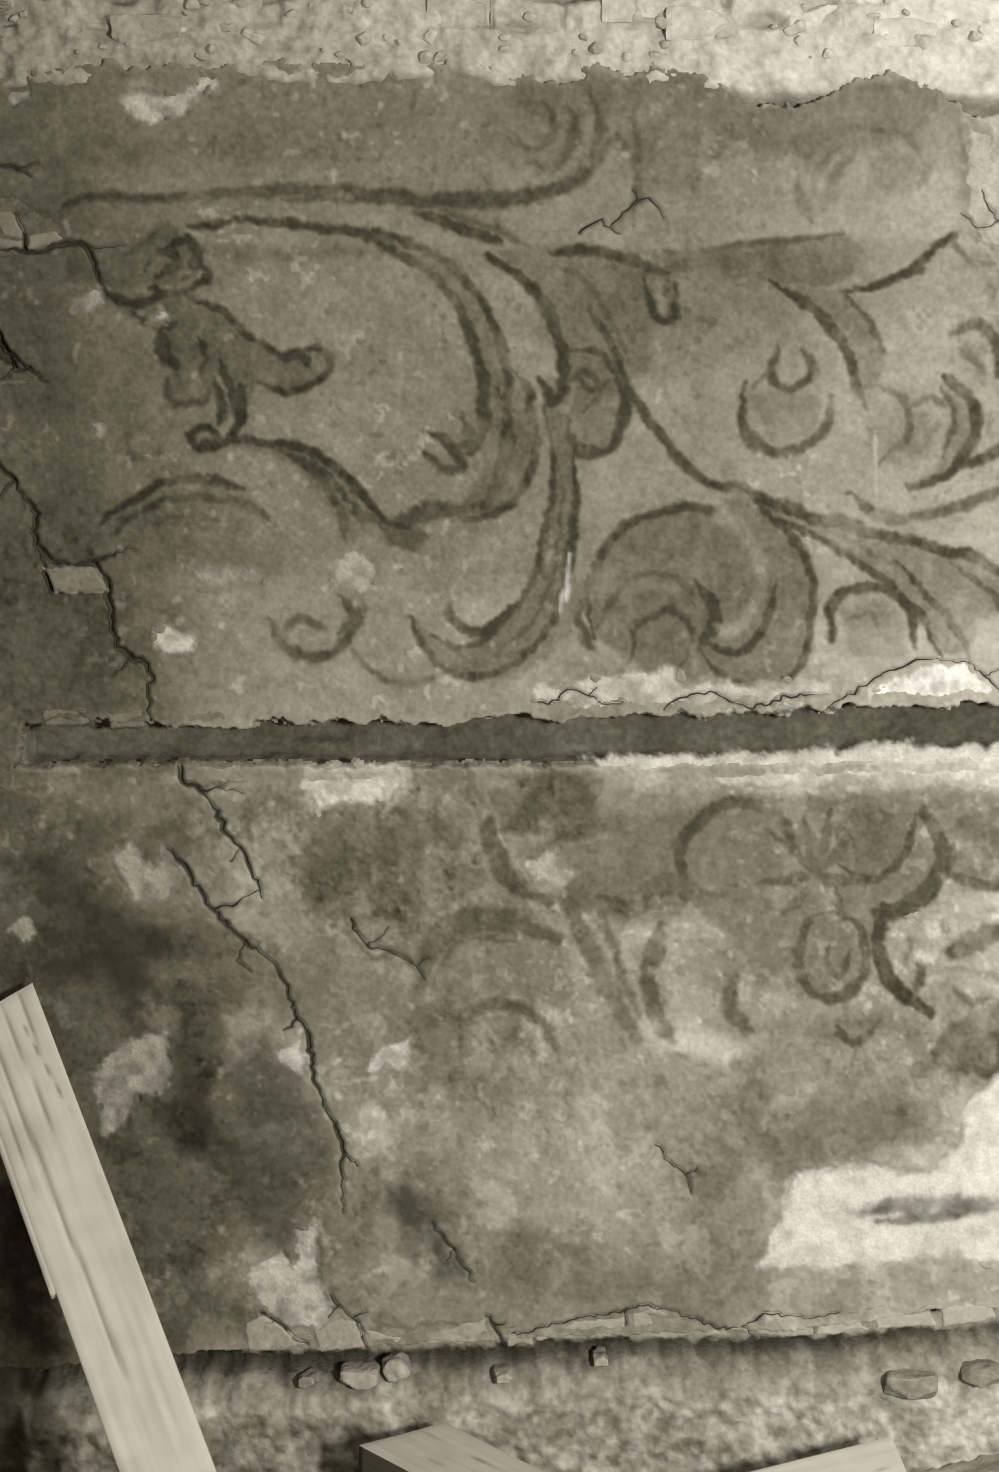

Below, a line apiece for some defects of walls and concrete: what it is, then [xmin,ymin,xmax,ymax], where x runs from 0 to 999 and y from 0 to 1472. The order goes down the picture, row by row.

peeling [123,77,218,125]
spalling [966,114,999,245]
crack [0,465,154,722]
crack [535,687,623,705]
crack [664,658,999,713]
peeling [871,656,992,697]
peeling [596,741,999,789]
crack [166,765,358,1213]
peeling [903,912,951,966]
peeling [758,1074,999,1274]
damp [4,1188,57,1349]
crack [431,1222,840,1345]